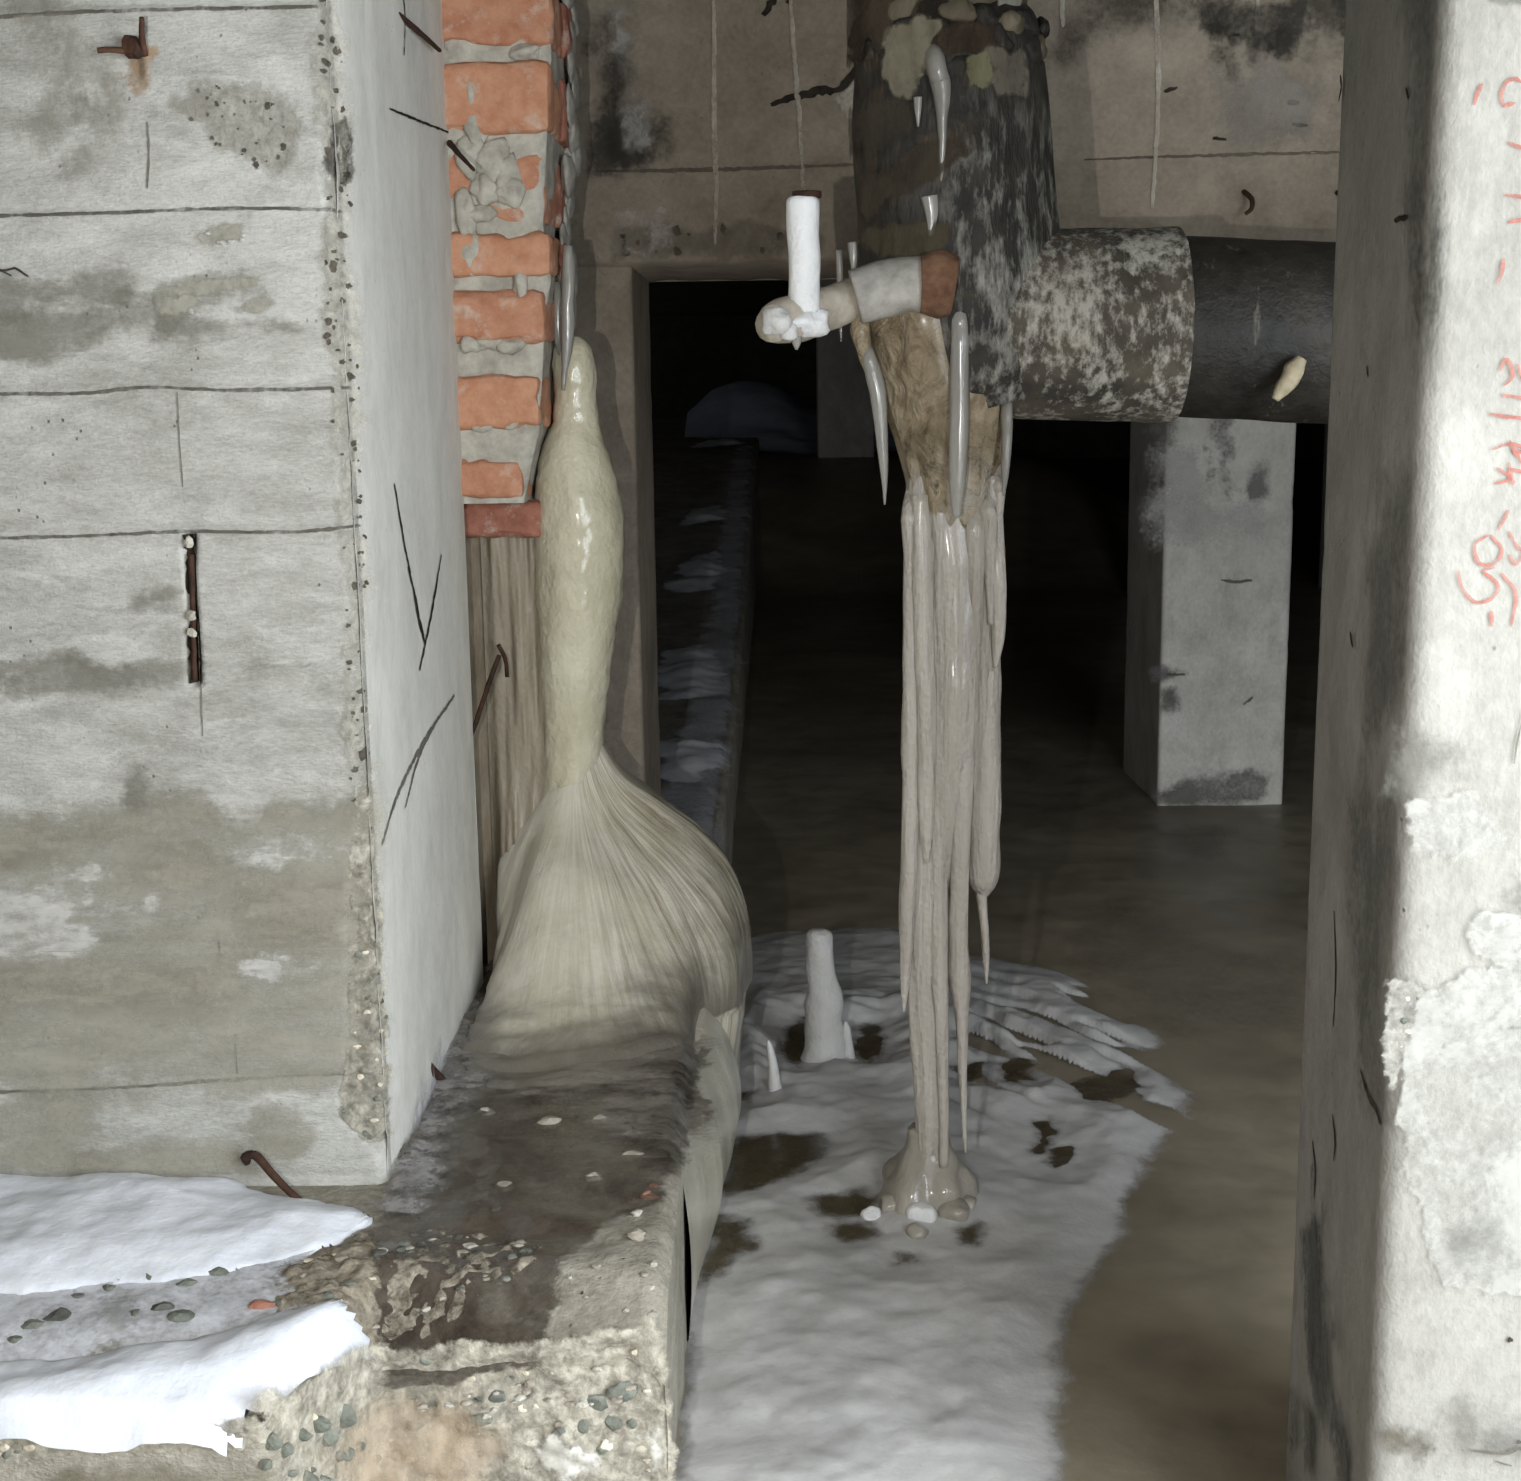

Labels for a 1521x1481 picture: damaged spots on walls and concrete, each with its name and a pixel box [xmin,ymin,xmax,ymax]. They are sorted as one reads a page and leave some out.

crack [770,67,855,107]
damp [0,273,211,362]
rust [183,534,200,684]
spalling [96,1316,679,1481]
spalling [0,1439,73,1465]